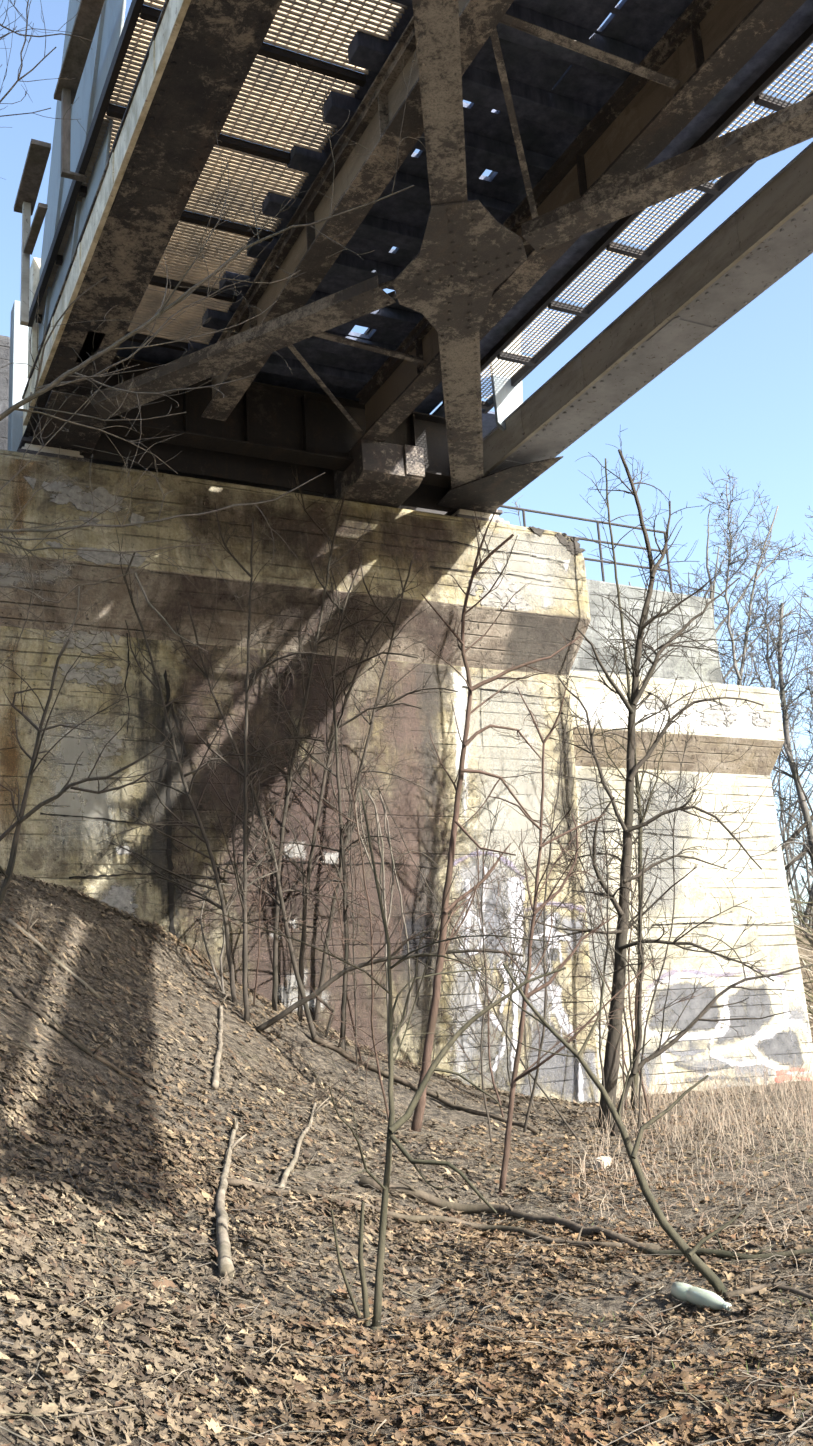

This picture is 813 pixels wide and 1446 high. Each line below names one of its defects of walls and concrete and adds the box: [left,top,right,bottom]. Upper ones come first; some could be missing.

spalling [696,704,773,728]
water stain [46,718,113,837]
water stain [125,495,777,1062]